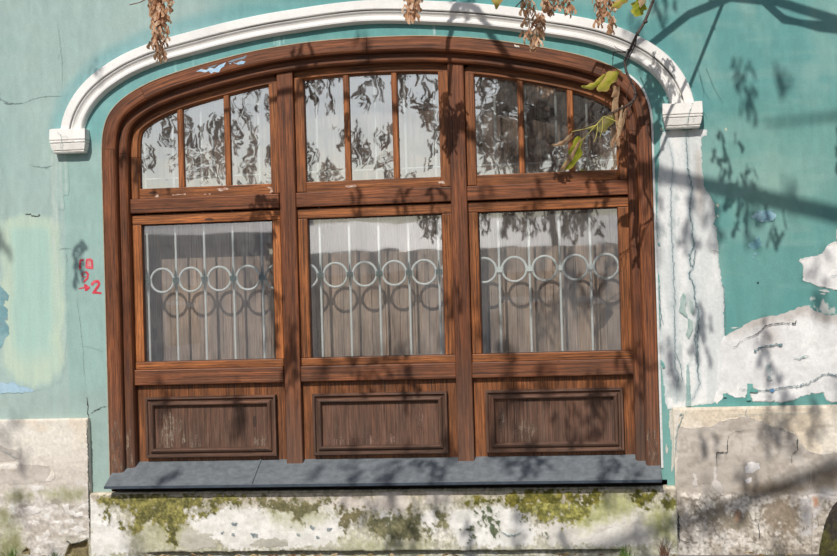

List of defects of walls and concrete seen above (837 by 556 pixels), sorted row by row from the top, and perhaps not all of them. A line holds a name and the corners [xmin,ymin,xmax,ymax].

peeling [196,55,247,73]
peeling [0,285,9,348]
flaking render [656,128,837,539]
crack [721,285,807,360]
crack [744,372,837,391]
crack [66,298,106,545]
crack [716,412,811,466]
spalling [0,446,55,492]
water stain [259,499,437,556]